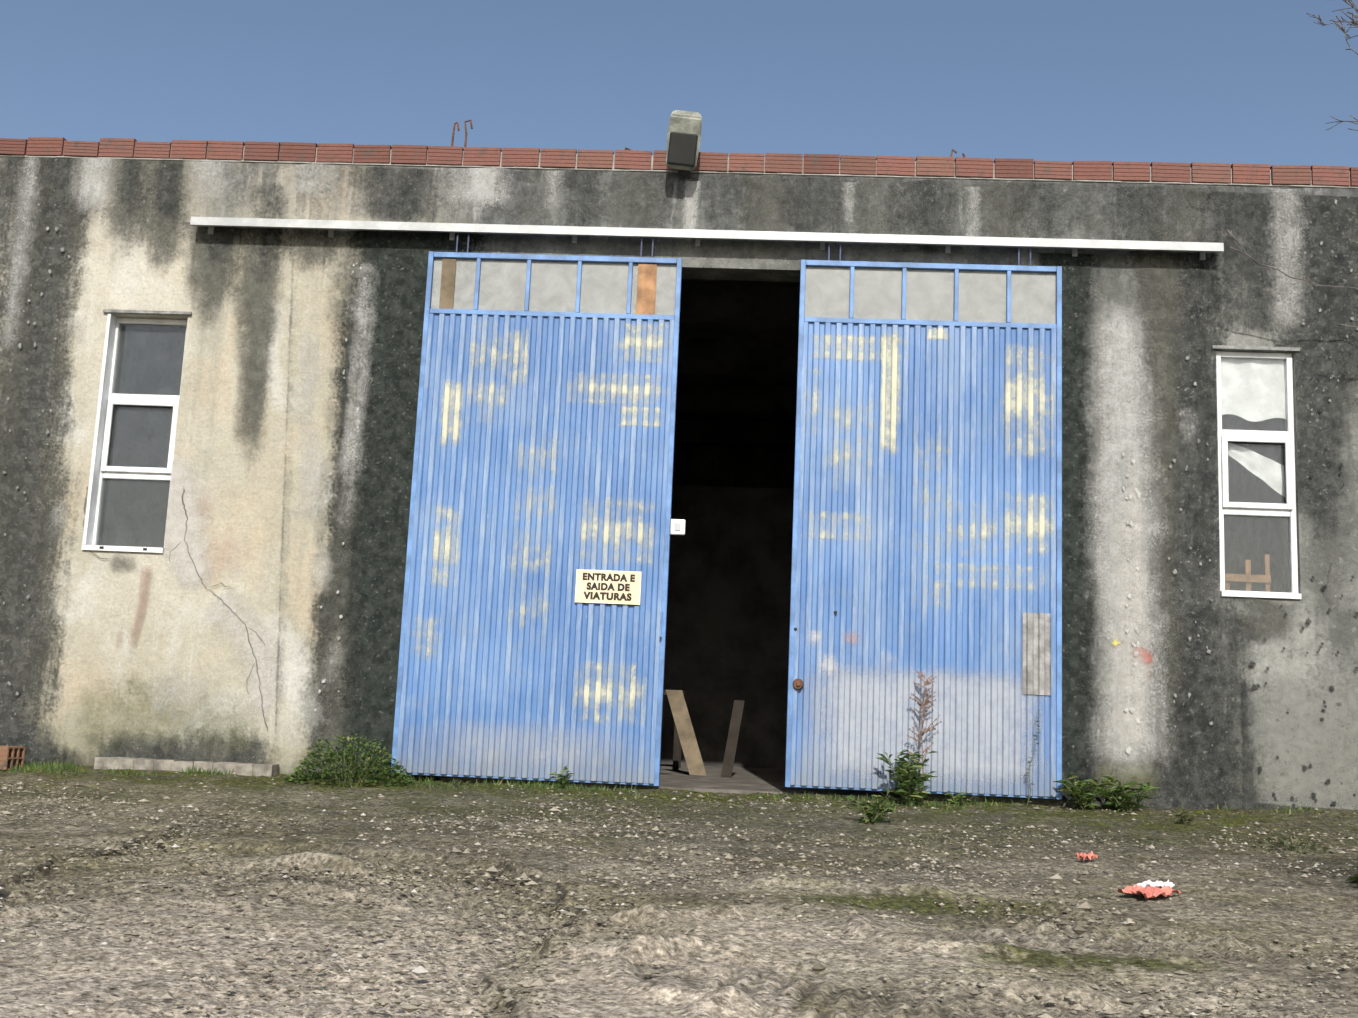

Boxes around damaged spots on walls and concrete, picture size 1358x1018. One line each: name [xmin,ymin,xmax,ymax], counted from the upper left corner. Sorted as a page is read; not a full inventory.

leakage [454,168,507,204]
leakage [539,169,601,226]
leakage [685,175,956,248]
peeling [441,383,461,442]
peeling [579,375,660,427]
peeling [824,334,899,452]
peeling [1005,348,1053,456]
leakage [0,157,484,781]
peeling [958,495,1053,552]
leakage [1038,185,1358,810]
crack [169,489,267,726]
peeling [576,663,643,722]